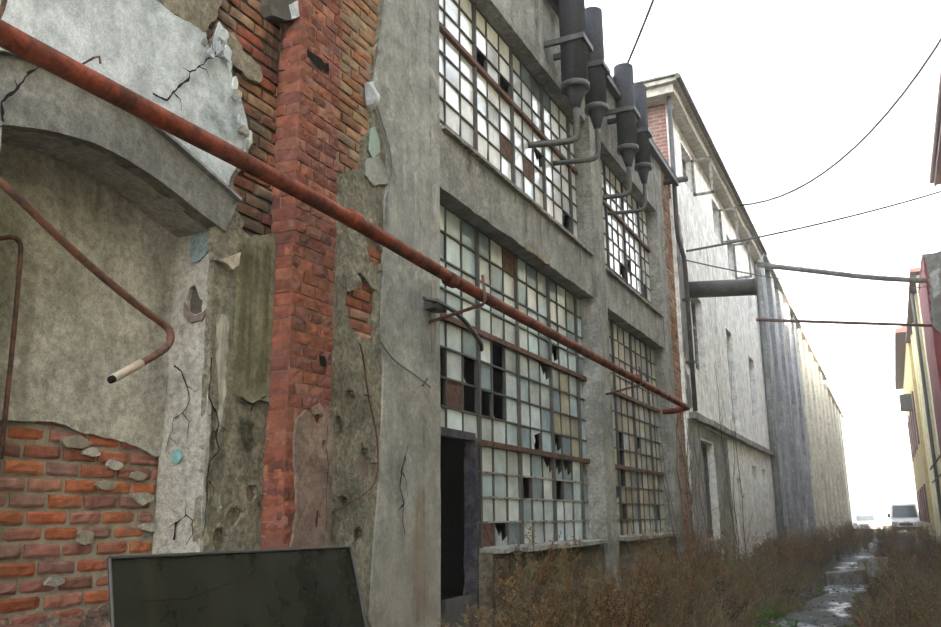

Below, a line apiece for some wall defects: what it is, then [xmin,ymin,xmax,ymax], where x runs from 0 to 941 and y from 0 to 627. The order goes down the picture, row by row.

crack [0,67,39,122]
crack [153,40,224,109]
flaking render [157,0,300,167]
flaking render [189,170,274,270]
flaking render [366,237,383,273]
flaking render [183,288,207,323]
flaking render [344,273,373,340]
crack [240,393,270,412]
crack [165,357,227,545]
flaking render [289,404,345,548]
flaking render [0,421,159,626]